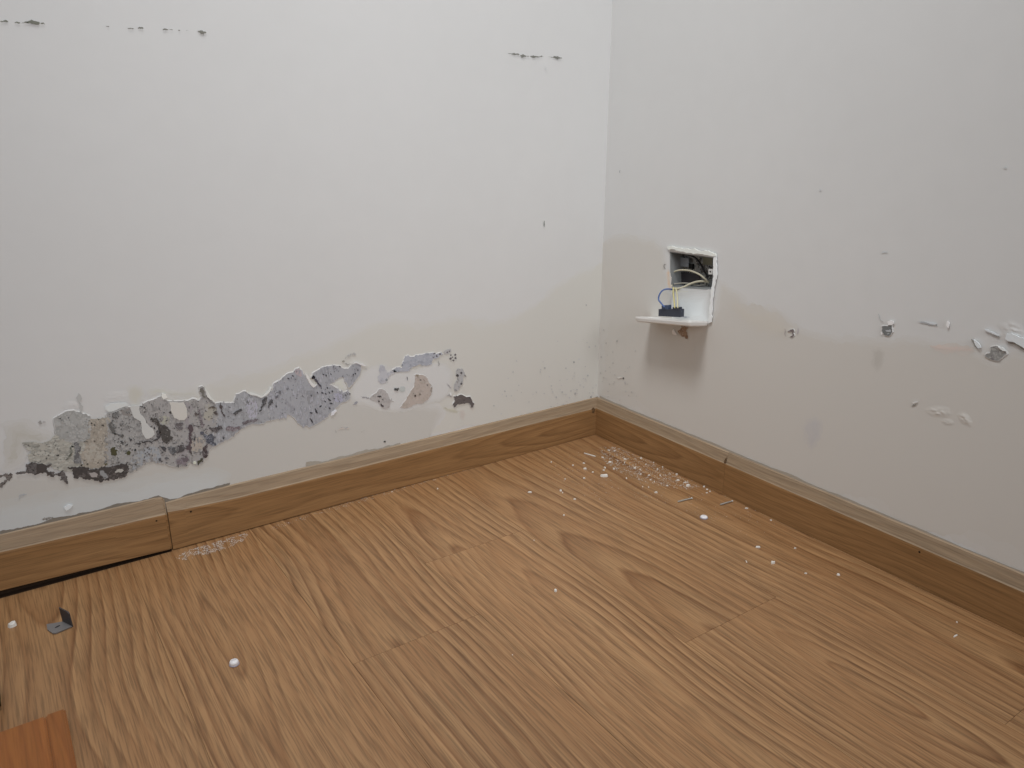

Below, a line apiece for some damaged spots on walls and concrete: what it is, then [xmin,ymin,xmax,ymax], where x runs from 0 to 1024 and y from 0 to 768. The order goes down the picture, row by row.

flaking render [667,246,718,339]
spalling [881,320,894,337]
spalling [974,329,1024,362]
peeling [22,349,475,474]